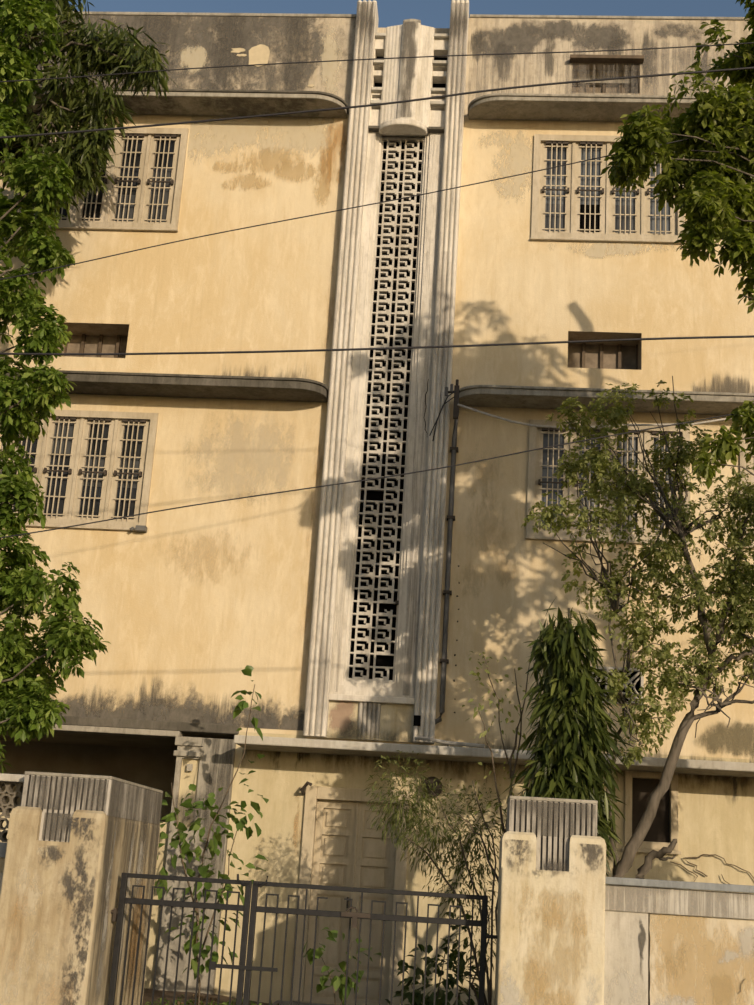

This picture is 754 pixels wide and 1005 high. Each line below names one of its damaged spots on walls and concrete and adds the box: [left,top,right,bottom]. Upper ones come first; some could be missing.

damp [29,15,325,115]
peeling [181,47,206,73]
peeling [231,44,270,67]
damp [449,12,630,77]
damp [642,24,699,83]
damp [693,377,750,393]
damp [56,684,304,731]
damp [701,723,754,761]
damp [175,738,233,878]
damp [678,774,748,796]
damp [581,844,604,865]
damp [27,776,163,1005]